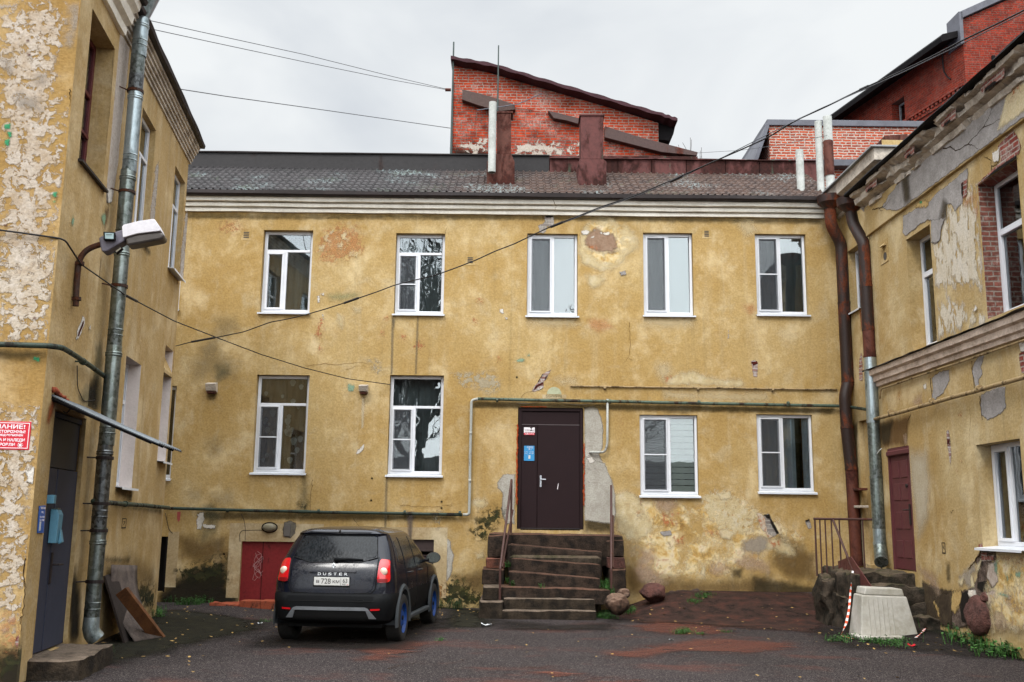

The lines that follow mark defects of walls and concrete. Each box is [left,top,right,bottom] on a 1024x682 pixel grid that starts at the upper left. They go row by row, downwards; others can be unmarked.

peeling [0,0,69,343]
peeling [579,216,638,287]
peeling [882,82,1024,339]
crack [943,109,1000,170]
peeling [923,370,949,400]
peeling [971,355,1006,420]
peeling [0,402,40,634]
peeling [498,474,515,524]
peeling [584,408,812,581]
peeling [958,544,1024,632]